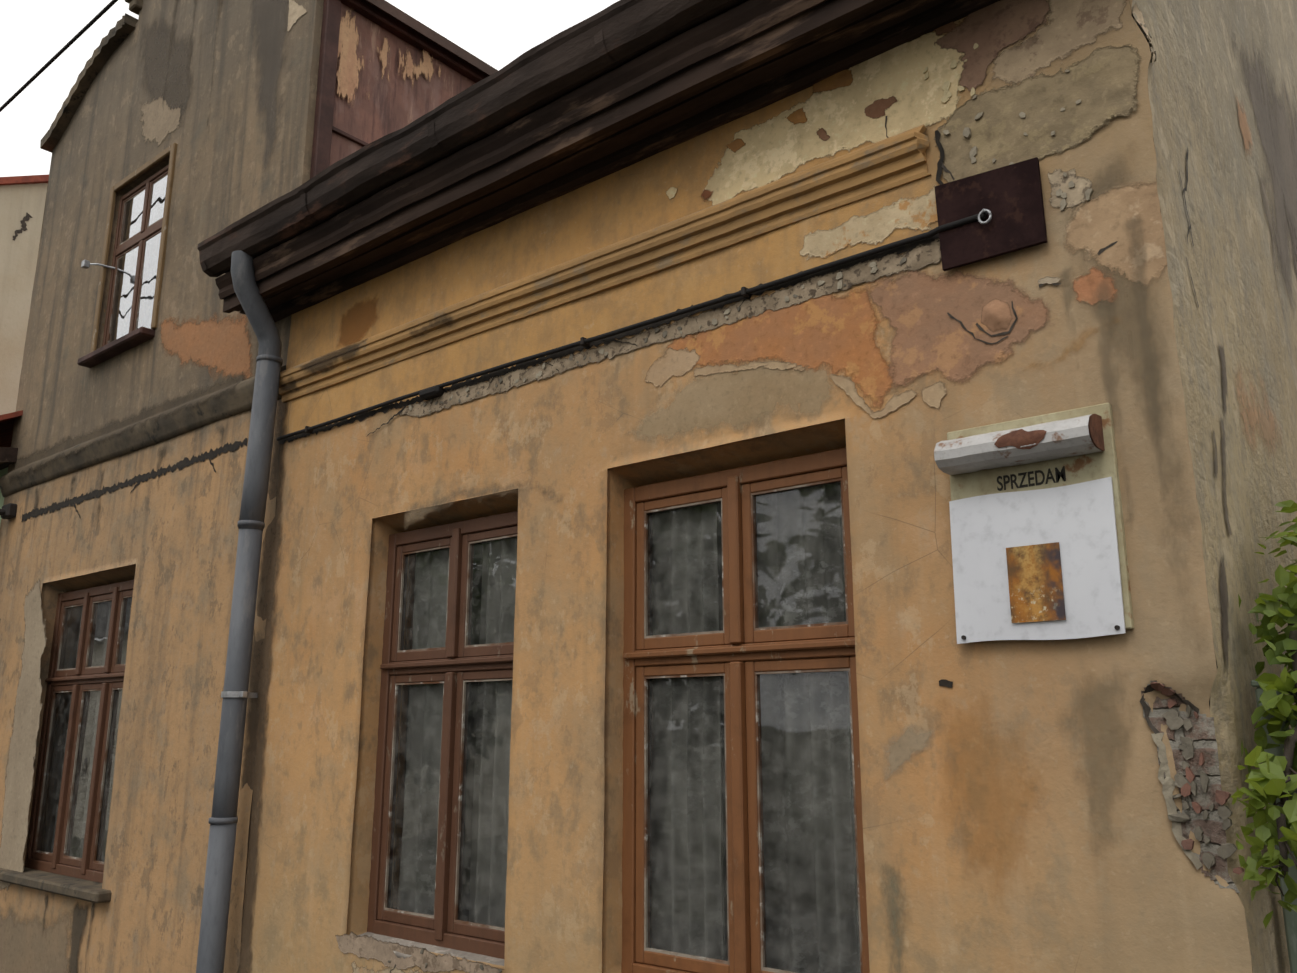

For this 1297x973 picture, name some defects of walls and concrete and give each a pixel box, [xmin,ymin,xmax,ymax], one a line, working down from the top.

crack [13,213,33,241]
flaking render [140,96,181,147]
flaking render [399,0,1167,419]
crack [1179,148,1199,307]
water stain [1243,55,1297,303]
flaking render [161,315,253,379]
flaking render [1140,680,1244,893]
flaking render [336,931,502,973]